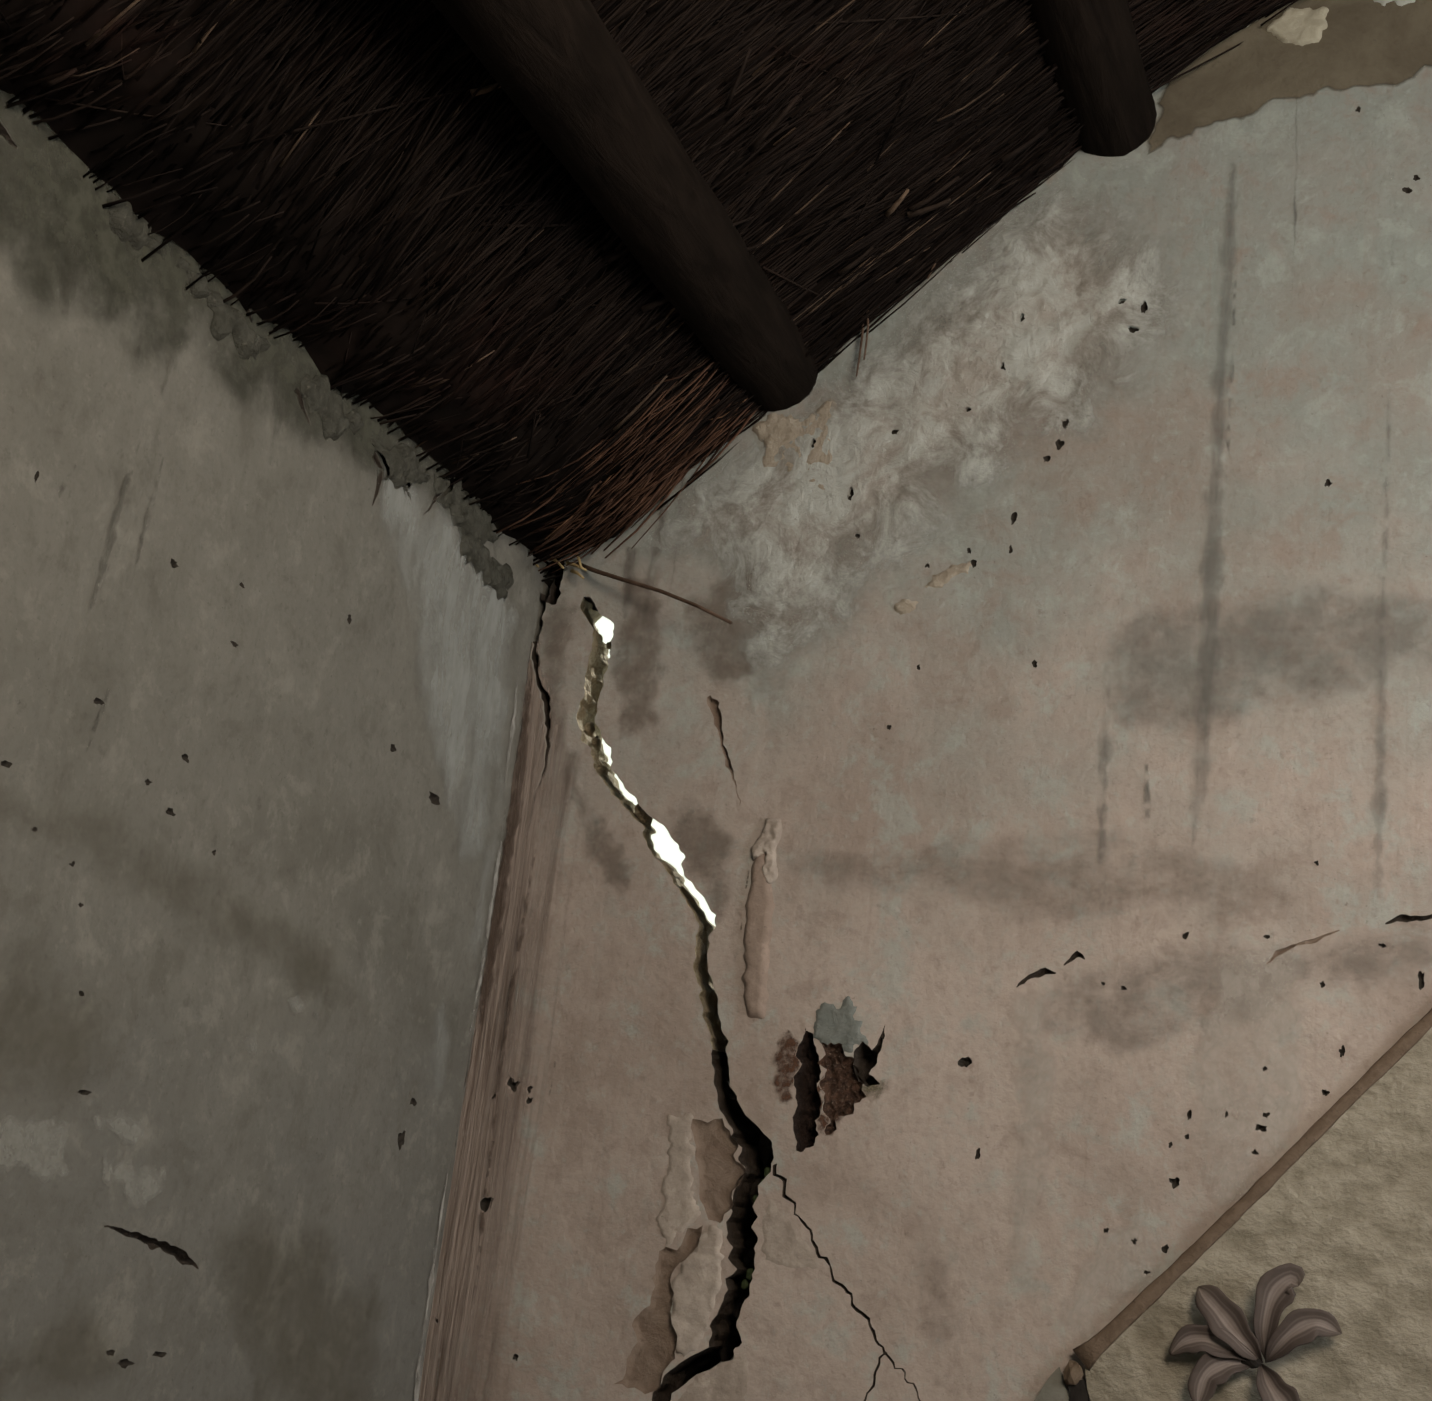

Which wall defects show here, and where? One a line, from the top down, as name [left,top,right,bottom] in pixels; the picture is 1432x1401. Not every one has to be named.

peeling [1148,0,1432,153]
crack [532,561,921,1401]
spalling [792,996,885,1152]
spalling [958,1057,972,1067]
crack [104,1225,199,1269]
spalling [615,1113,746,1394]
spalling [678,1354,749,1401]